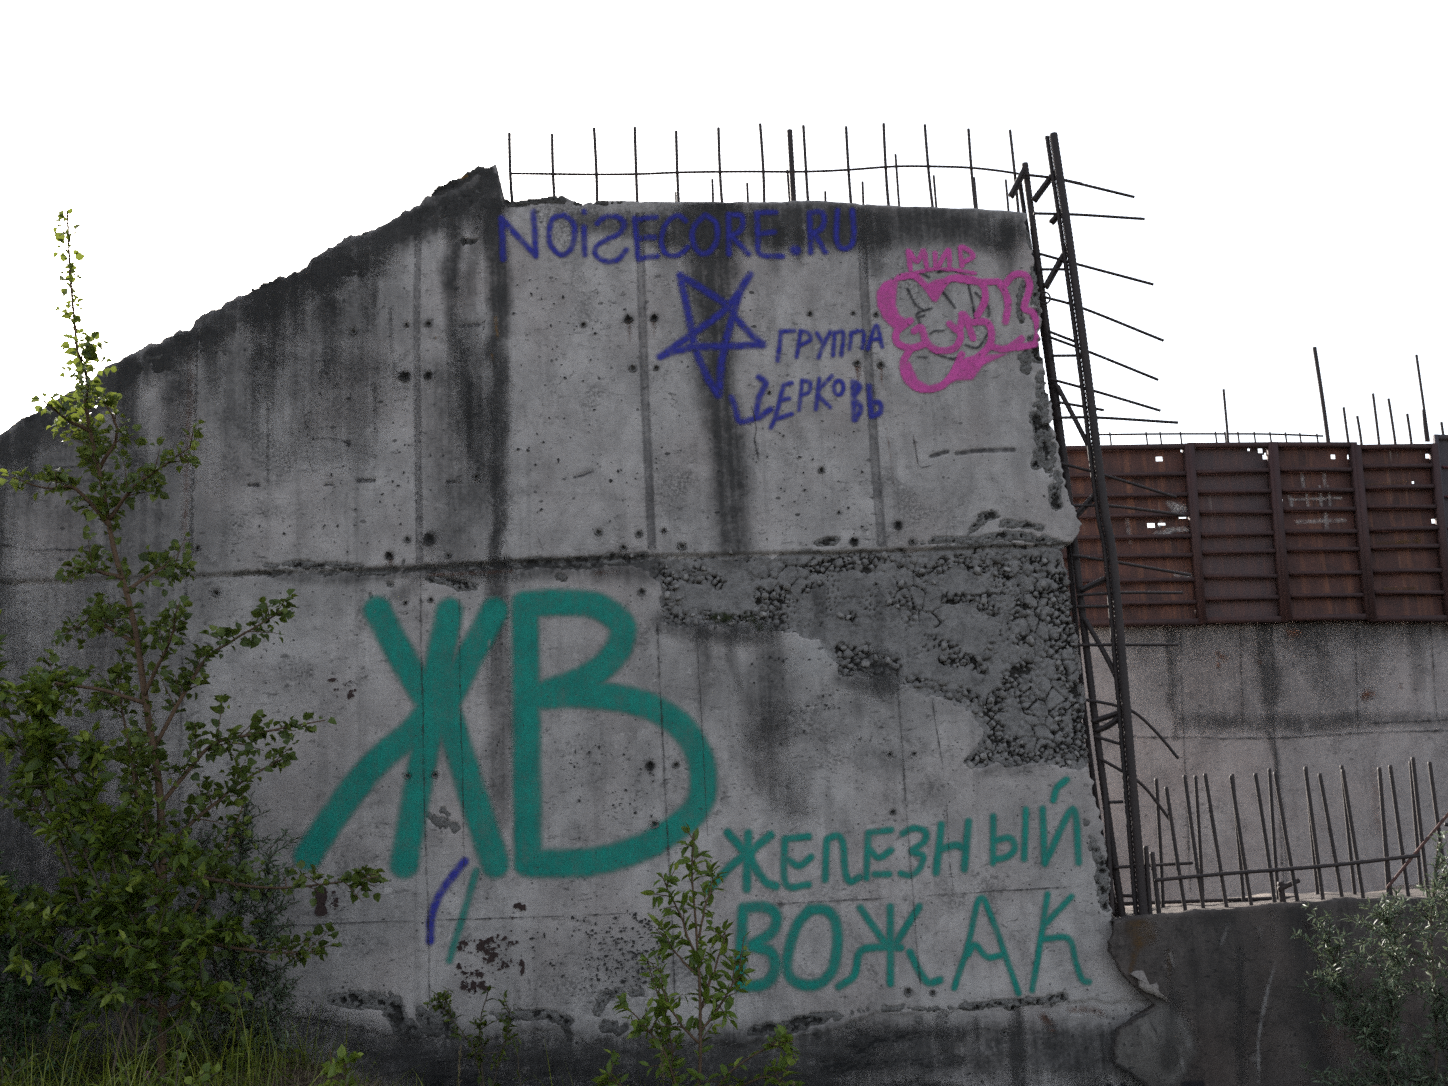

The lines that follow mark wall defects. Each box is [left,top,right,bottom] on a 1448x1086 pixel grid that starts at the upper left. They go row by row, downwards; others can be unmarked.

leakage [0,170,655,625]
leakage [577,203,1025,558]
spalling [772,429,872,547]
spalling [915,510,1062,548]
leakage [0,659,170,1063]
leakage [264,1010,1120,1086]